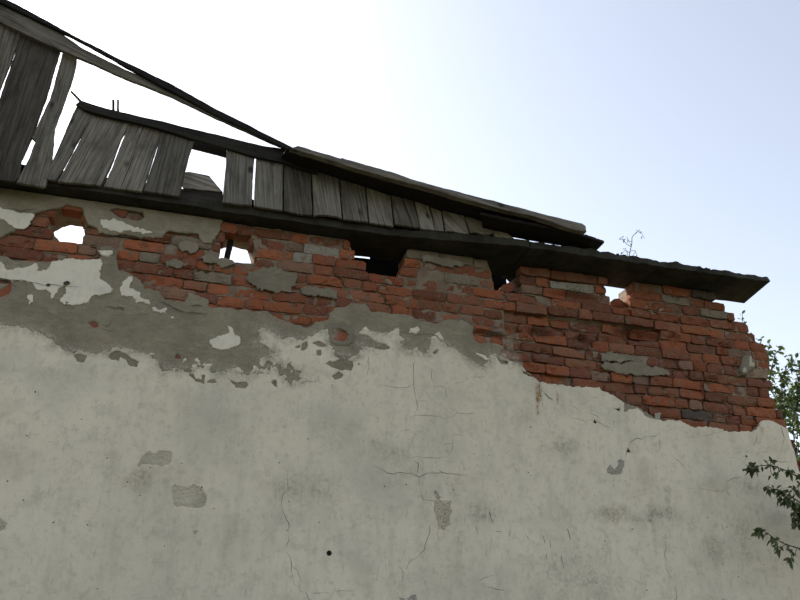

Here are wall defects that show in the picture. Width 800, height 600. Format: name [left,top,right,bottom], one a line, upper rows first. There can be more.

peeling [0,188,223,244]
peeling [0,255,508,388]
crack [376,362,472,502]
spalling [138,451,172,468]
spalling [607,448,631,475]
spalling [172,485,215,509]
spalling [434,490,452,530]